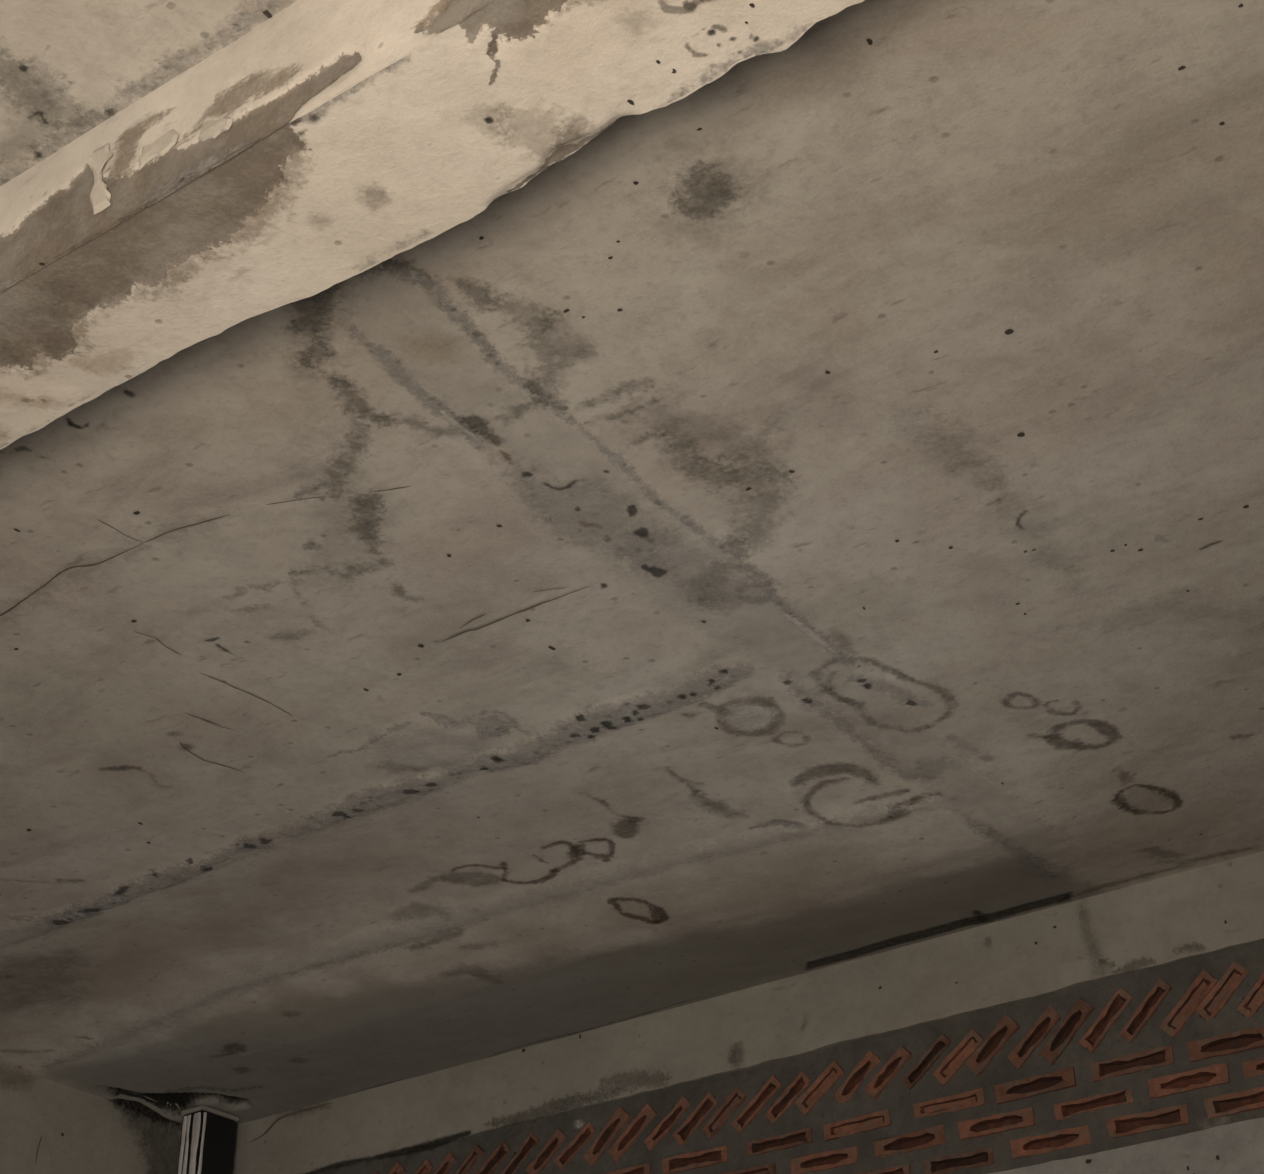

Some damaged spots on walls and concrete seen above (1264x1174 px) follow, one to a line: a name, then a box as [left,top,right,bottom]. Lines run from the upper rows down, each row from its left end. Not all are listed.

peeling [415,0,567,85]
peeling [0,52,361,370]
damp [462,417,499,444]
crack [0,515,227,616]
damp [726,700,773,731]
damp [1113,785,1181,814]
damp [453,820,639,884]
damp [608,898,668,924]